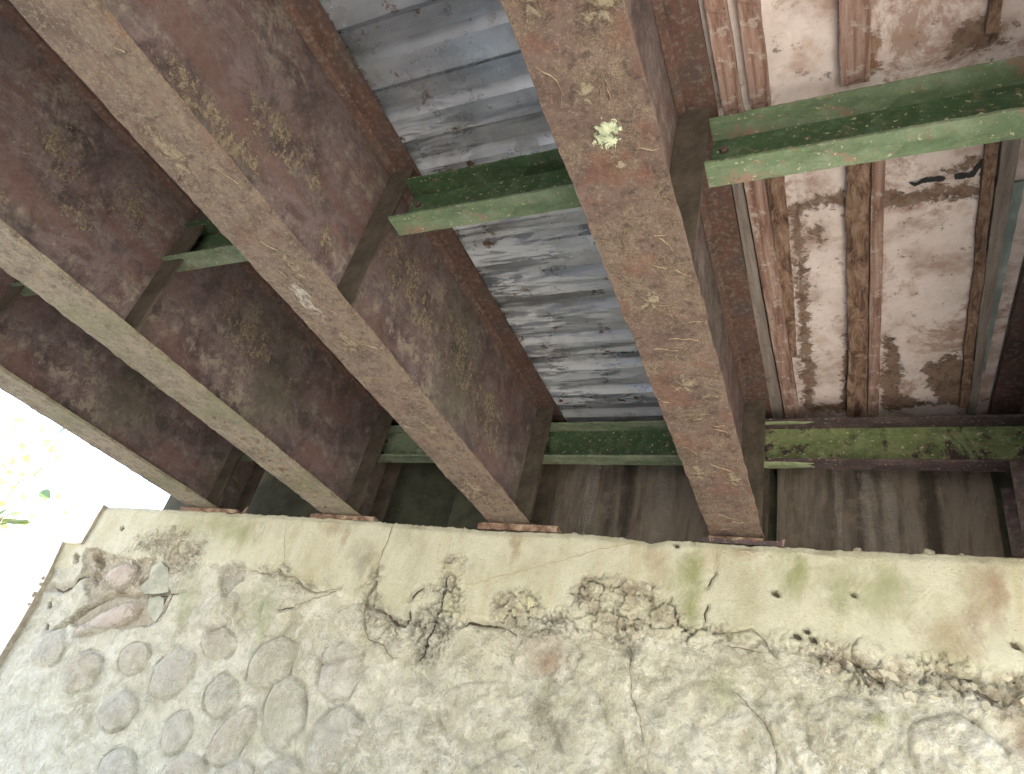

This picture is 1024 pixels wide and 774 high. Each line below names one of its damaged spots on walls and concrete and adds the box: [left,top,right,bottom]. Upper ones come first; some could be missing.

spalling [74,527,203,634]
crack [364,525,517,661]
flaking render [579,578,692,641]
crack [704,572,774,655]
flaking render [794,630,861,674]
crack [848,659,882,684]
flaking render [870,665,949,702]
crack [957,679,1000,702]
flaking render [962,666,1002,710]